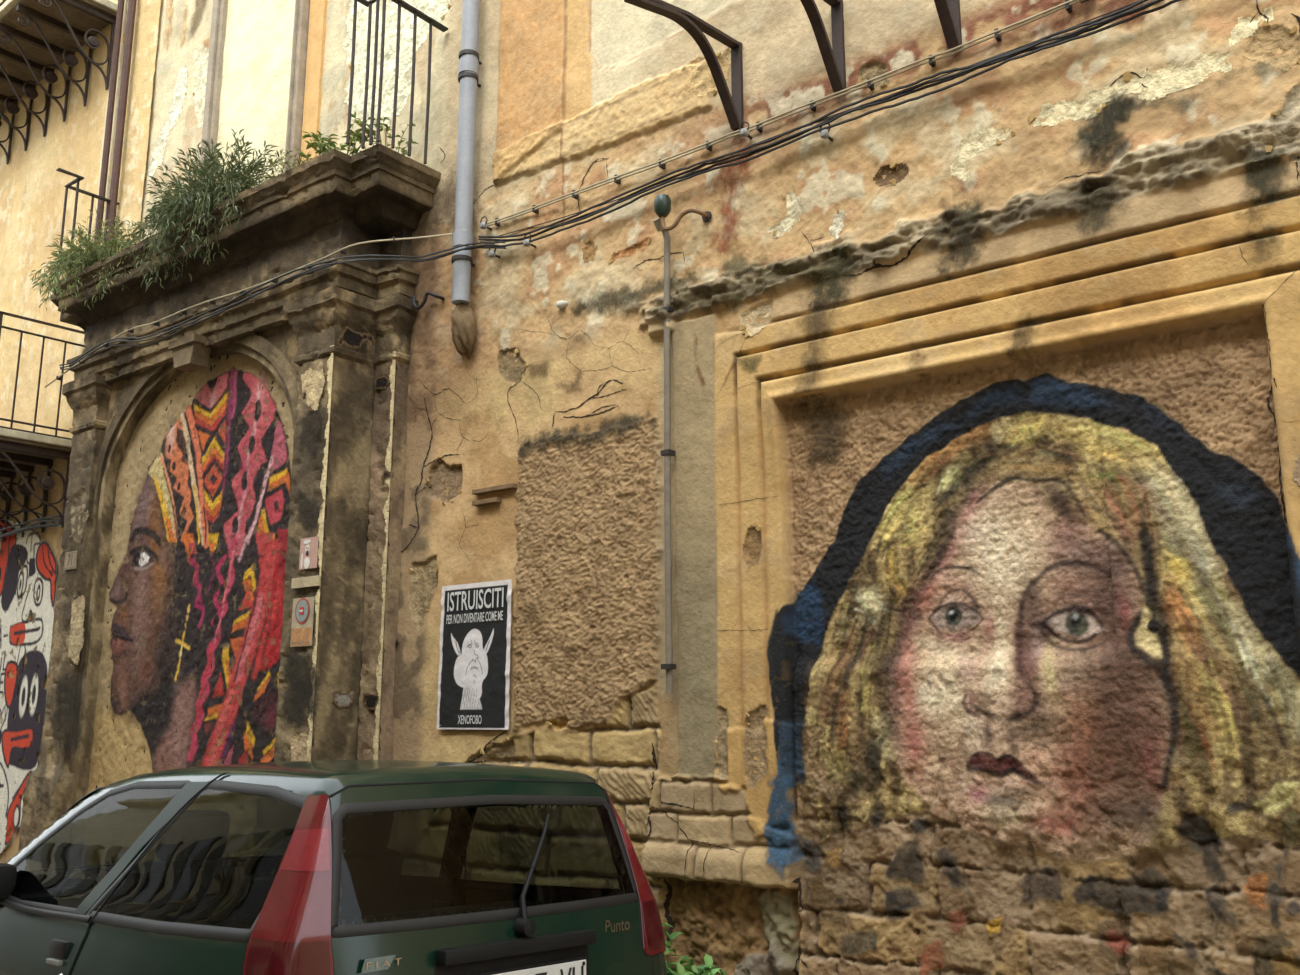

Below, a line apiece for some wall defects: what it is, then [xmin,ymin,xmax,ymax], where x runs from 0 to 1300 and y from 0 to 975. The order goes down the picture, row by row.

spalling [1028,7,1300,127]
damp [1254,62,1284,75]
spalling [873,163,909,187]
spalling [950,126,1016,182]
spalling [1241,83,1300,181]
spalling [766,190,804,238]
spalling [829,209,845,239]
spalling [497,347,528,385]
crack [401,317,649,552]
spalling [425,457,463,506]
spalling [466,737,518,766]
spalling [713,705,768,789]